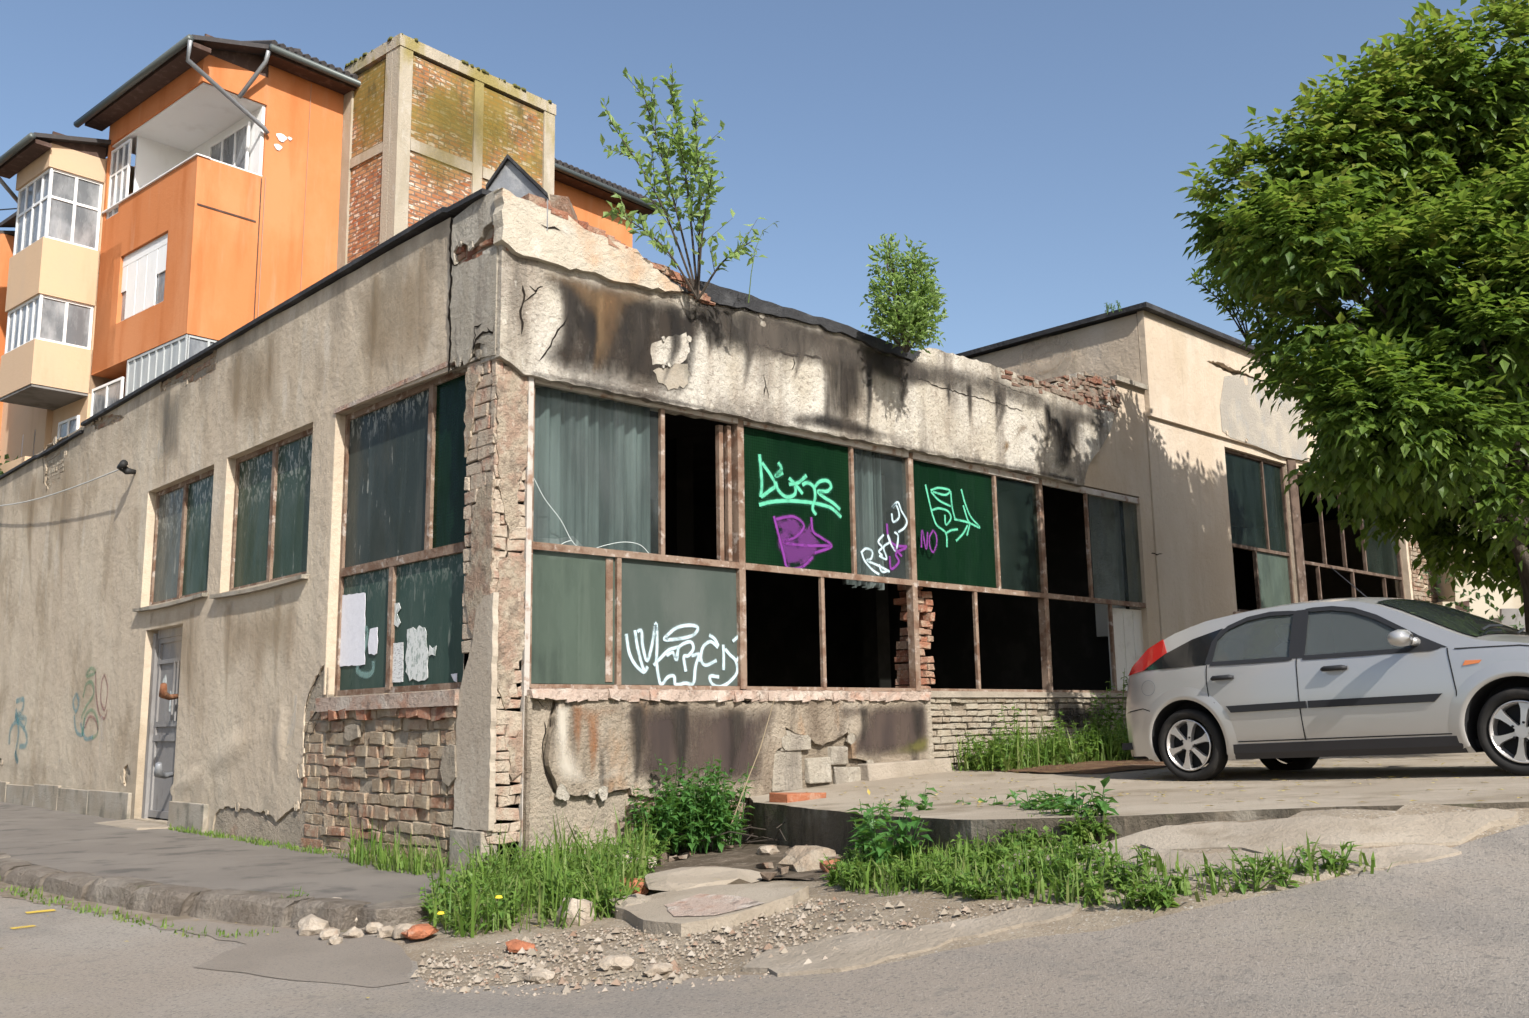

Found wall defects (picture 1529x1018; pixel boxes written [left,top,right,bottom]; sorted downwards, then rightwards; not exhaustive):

flaking render [456,209,509,263]
crack [447,217,566,373]
flaking render [650,333,692,390]
water stain [554,281,1093,481]
flaking render [450,349,528,653]
flaking render [213,668,458,869]
flaking render [483,661,749,859]
flaking render [771,730,874,793]